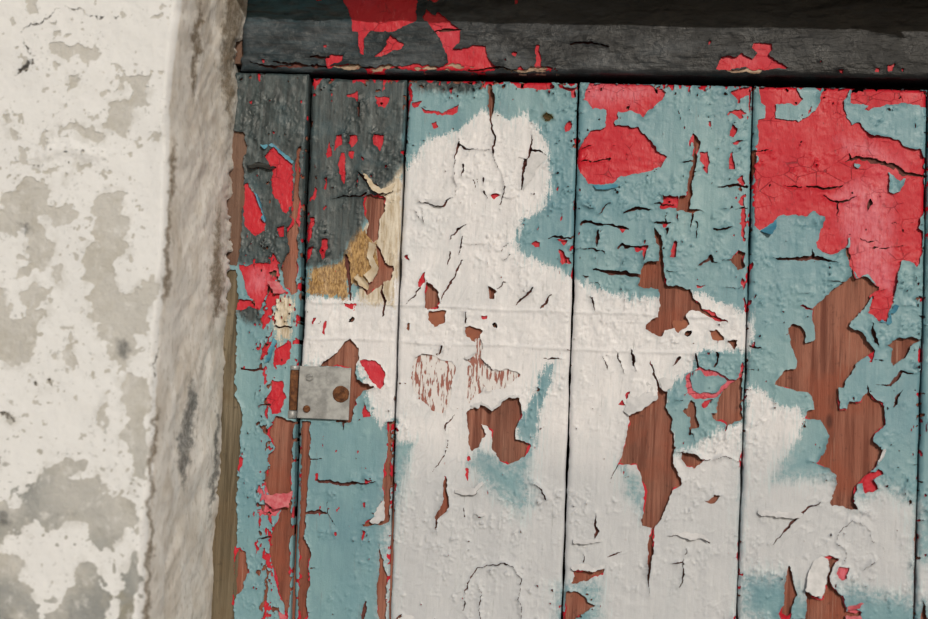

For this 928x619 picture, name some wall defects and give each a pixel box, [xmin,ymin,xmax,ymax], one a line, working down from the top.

crack [454,122,547,205]
peeling [511,82,711,191]
crack [785,185,873,214]
crack [845,153,926,179]
peeling [0,51,164,619]
crack [441,225,480,299]
crack [497,245,552,309]
peeling [635,228,737,349]
crack [773,251,842,283]
peeling [725,87,928,510]
peeling [466,395,532,465]
peeling [618,361,749,593]